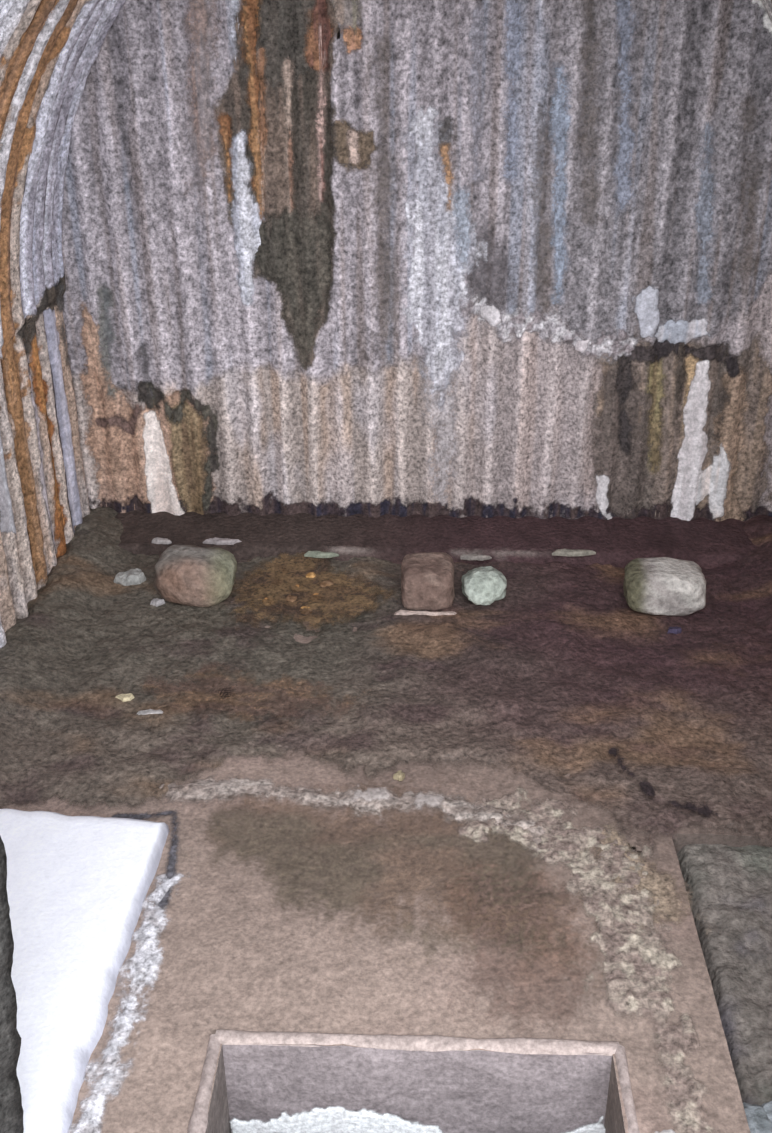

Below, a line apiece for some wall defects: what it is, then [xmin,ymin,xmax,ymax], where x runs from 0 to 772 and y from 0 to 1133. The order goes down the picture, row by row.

corrosion [343,26,362,53]
peeling [0,434,17,539]
corrosion [0,0,78,584]
peeling [17,274,219,548]
spalling [214,0,378,369]
peeling [459,286,772,521]